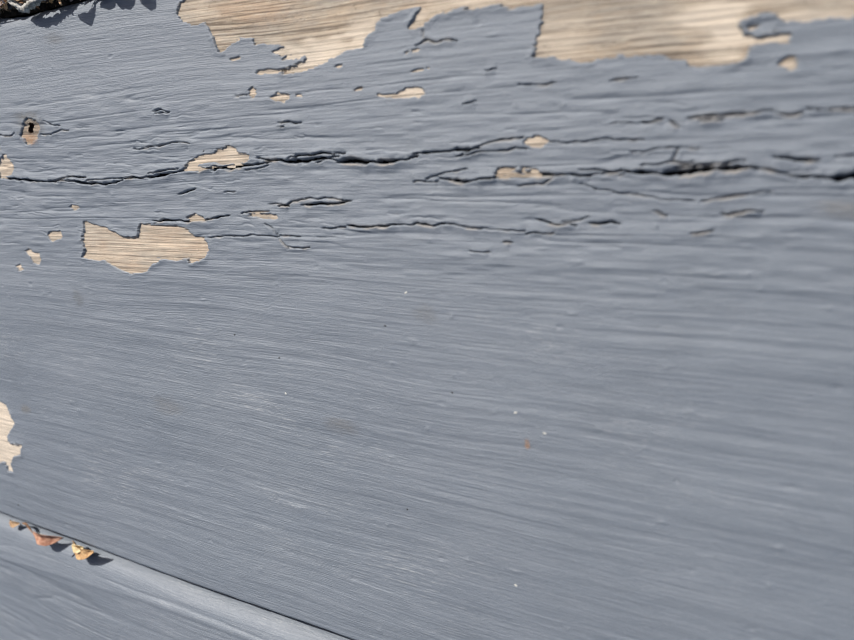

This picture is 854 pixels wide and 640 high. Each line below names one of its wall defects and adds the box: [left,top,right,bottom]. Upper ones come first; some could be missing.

peeling [178,0,854,75]
peeling [378,87,425,99]
peeling [0,154,14,179]
crack [7,169,196,194]
peeling [184,145,250,172]
crack [214,138,525,183]
peeling [495,167,542,179]
crack [520,113,854,216]
peeling [83,214,209,274]
crack [154,197,350,249]
crack [326,220,621,253]
peeling [0,402,22,471]